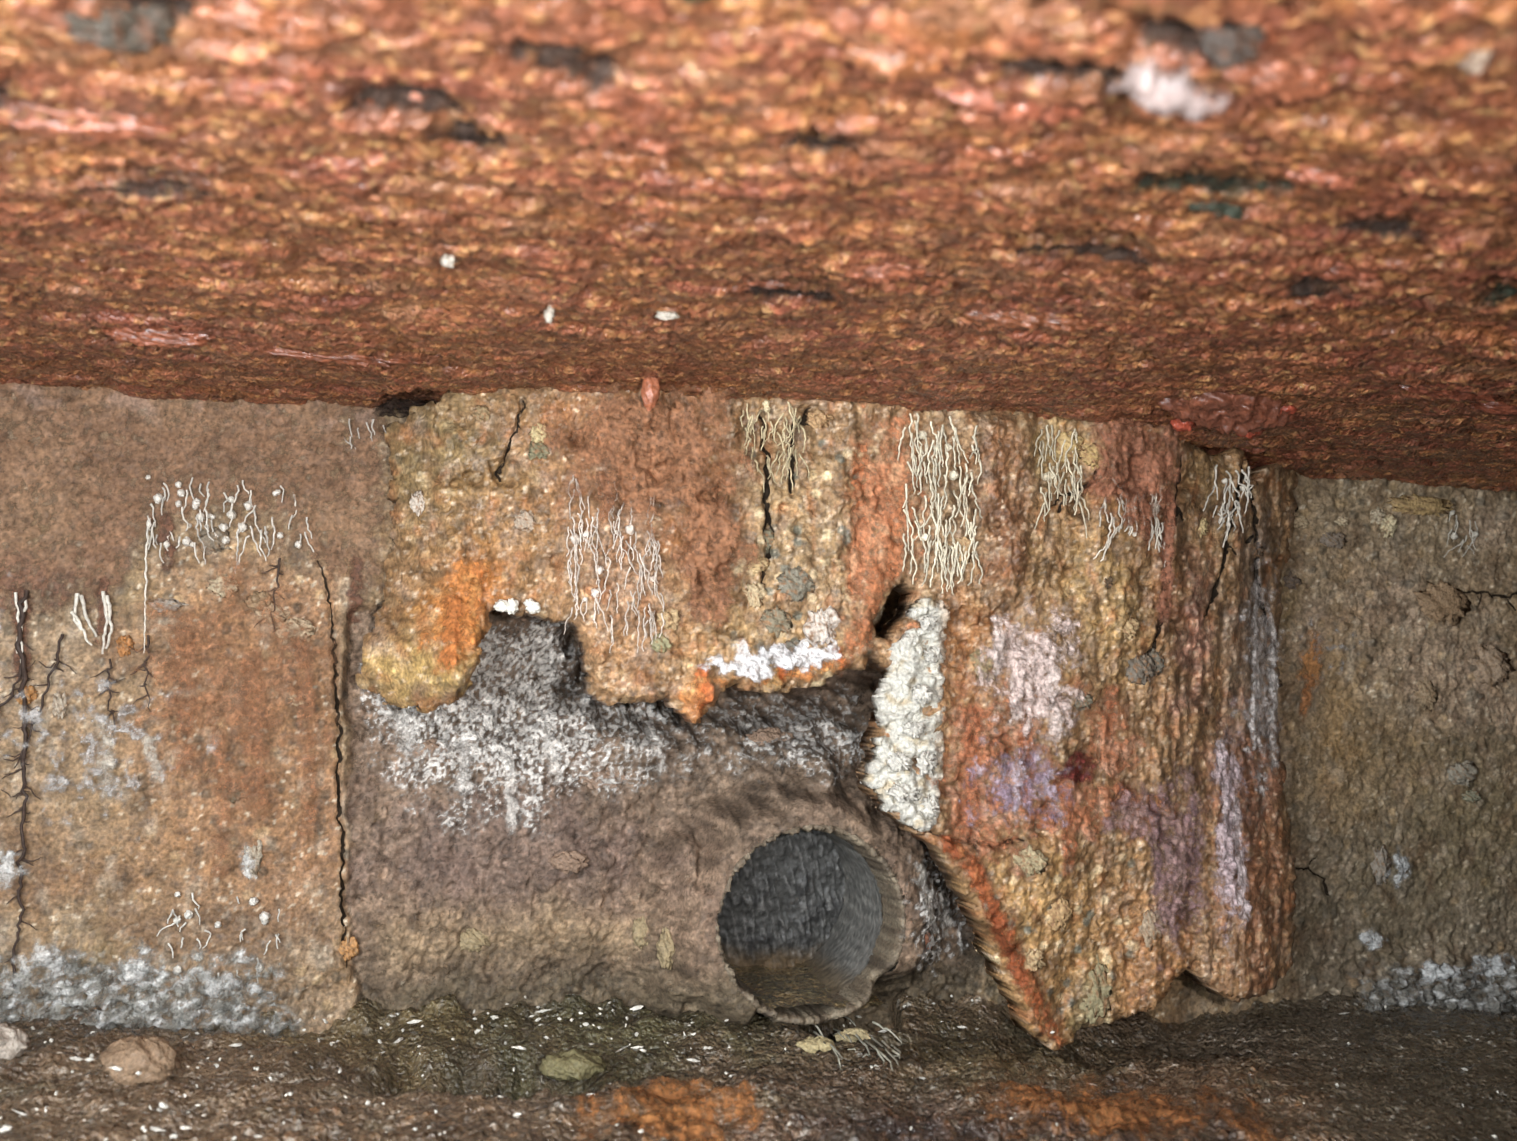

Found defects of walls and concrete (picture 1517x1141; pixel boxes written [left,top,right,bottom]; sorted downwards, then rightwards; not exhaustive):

corrosion [0,102,187,142]
corrosion [844,44,1085,125]
corrosion [1221,62,1333,104]
damp [0,383,387,747]
corrosion [763,414,943,686]
damp [47,679,176,798]
crack [317,560,347,968]
damp [361,598,951,833]
spalling [344,606,985,1031]
damp [967,603,1084,826]
corrosion [919,676,1195,1045]
damp [0,942,302,1037]